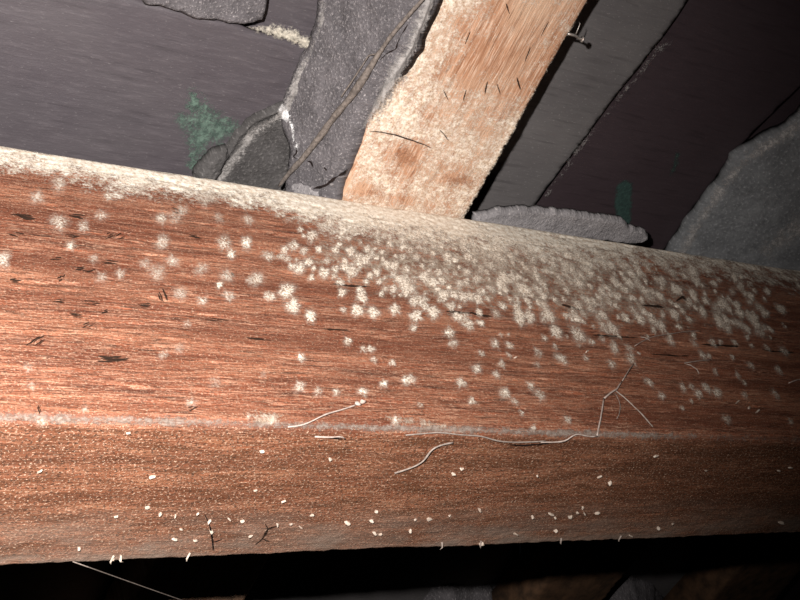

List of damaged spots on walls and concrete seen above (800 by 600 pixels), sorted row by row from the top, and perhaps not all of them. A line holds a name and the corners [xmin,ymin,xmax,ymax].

leakage [0,0,800,361]
leakage [0,414,236,427]
leakage [247,414,291,427]
leakage [303,416,681,439]